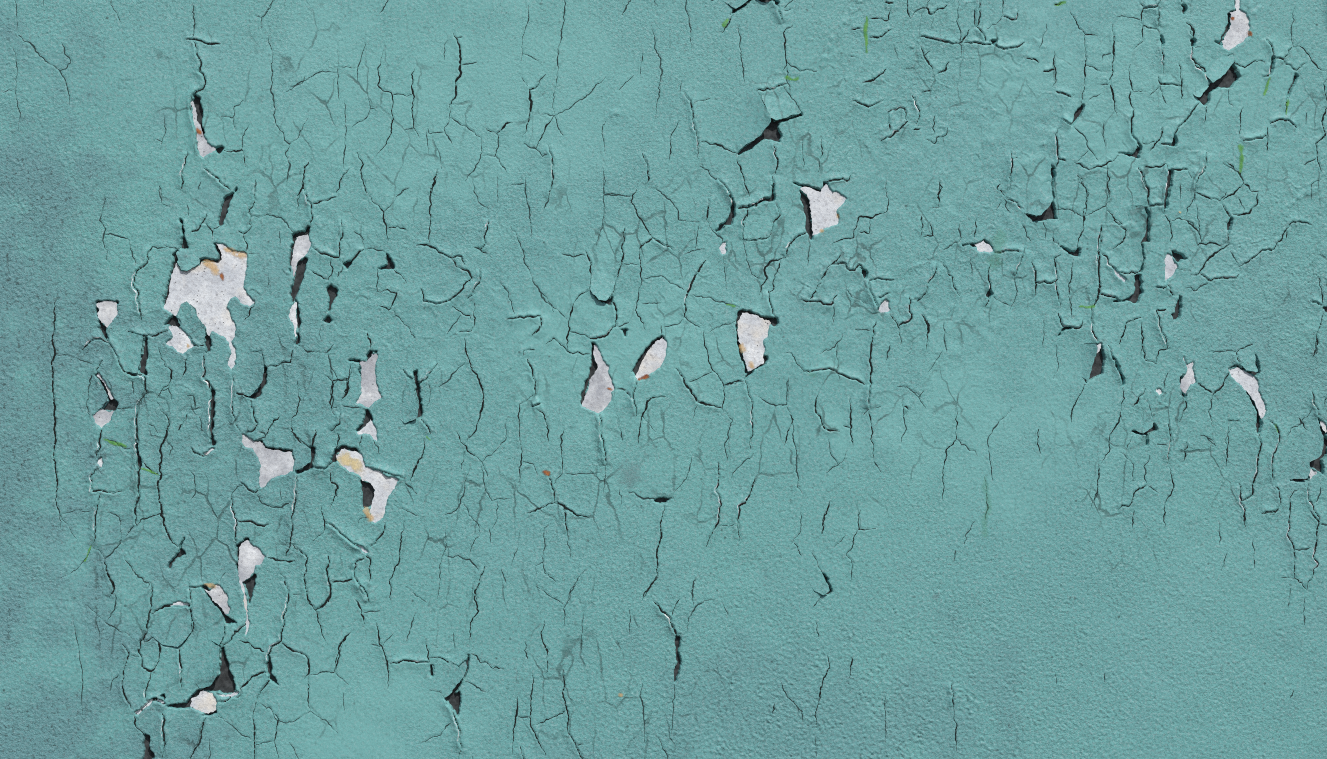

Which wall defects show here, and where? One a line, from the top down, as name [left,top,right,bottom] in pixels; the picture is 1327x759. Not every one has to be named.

peeling [1193,0,1249,105]
peeling [164,243,267,399]
peeling [242,434,315,488]
peeling [332,351,398,523]
crack [51,0,977,759]
peeling [735,310,777,377]
peeling [794,183,847,239]
crack [942,399,1007,560]
crack [853,0,1312,528]
peeling [1214,344,1266,432]
crack [1239,391,1327,624]
peeling [169,538,292,715]